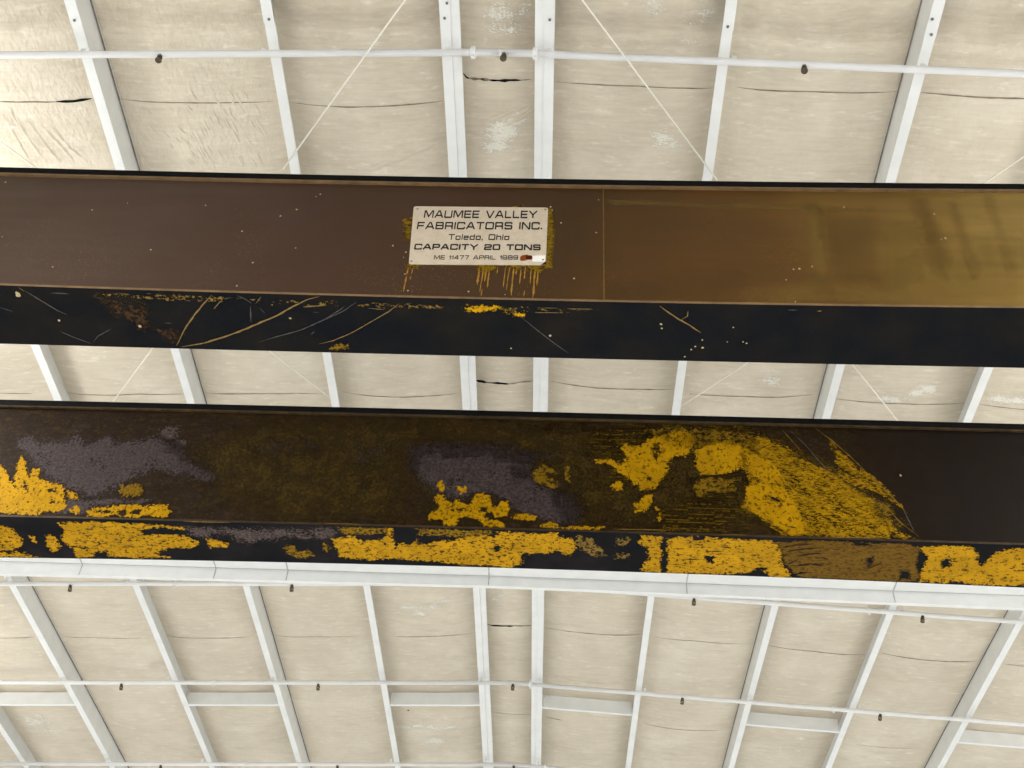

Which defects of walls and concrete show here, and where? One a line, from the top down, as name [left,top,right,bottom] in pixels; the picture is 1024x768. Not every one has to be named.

water stain [480,109,533,155]
peeling [0,424,1024,587]